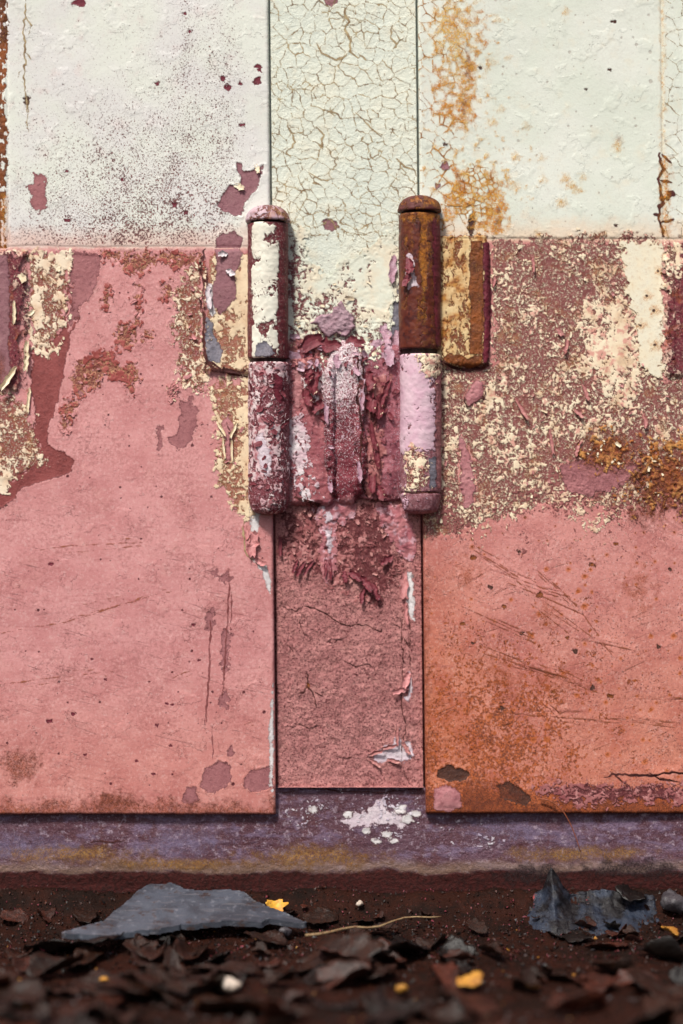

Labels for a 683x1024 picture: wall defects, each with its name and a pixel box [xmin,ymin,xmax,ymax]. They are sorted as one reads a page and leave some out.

corrosion [429,0,499,130]
corrosion [0,0,10,248]
crack [270,0,499,254]
peeling [25,172,48,215]
peeling [217,162,264,216]
peeling [0,217,683,625]
corrosion [570,422,683,527]
peeling [367,727,414,768]
corrosion [425,745,683,813]
peeling [497,776,683,811]
crack [604,771,683,784]